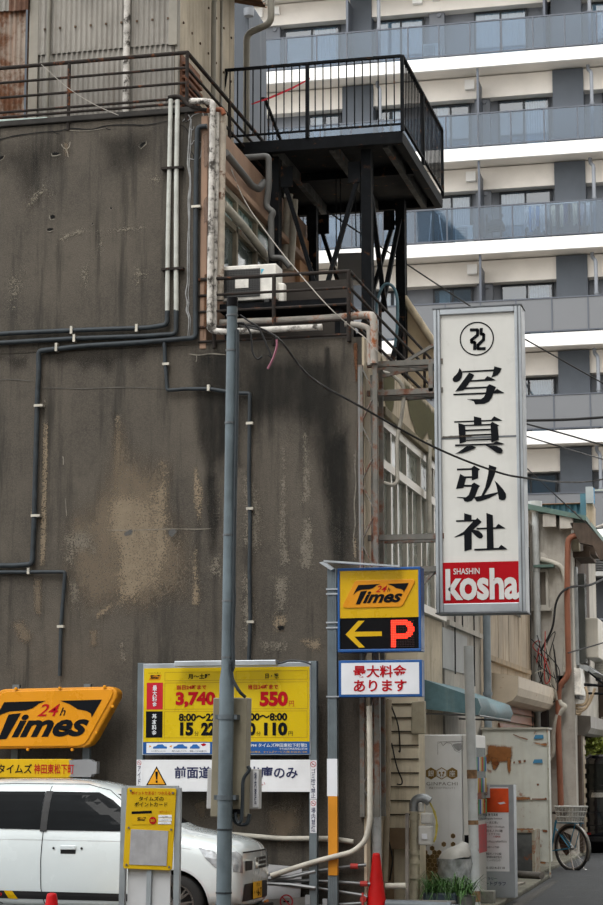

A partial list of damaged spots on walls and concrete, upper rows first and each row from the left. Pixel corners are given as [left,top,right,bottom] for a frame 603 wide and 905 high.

water stain [192,355,226,540]
water stain [272,445,314,613]
water stain [247,348,346,561]